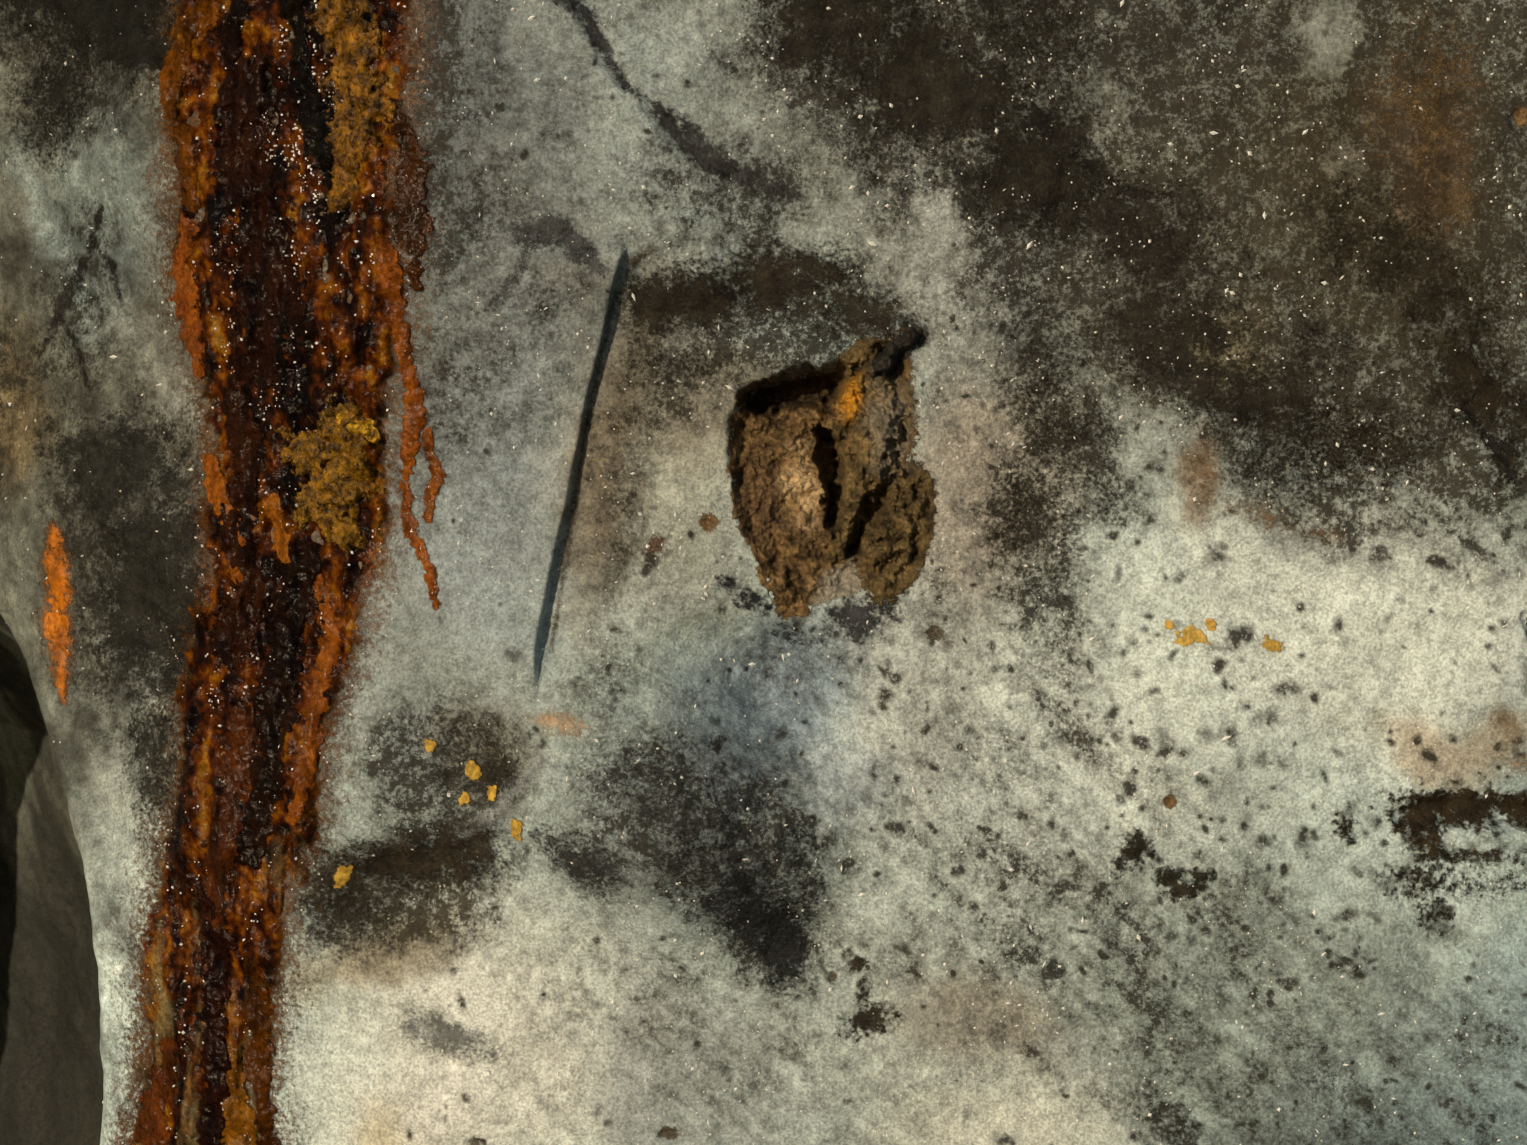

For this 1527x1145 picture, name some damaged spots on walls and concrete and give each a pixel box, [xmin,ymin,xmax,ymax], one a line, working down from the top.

water stain [611,233,927,394]
water stain [740,0,1527,610]
rust [35,519,80,706]
rust [105,0,446,1145]
spalling [699,325,939,623]